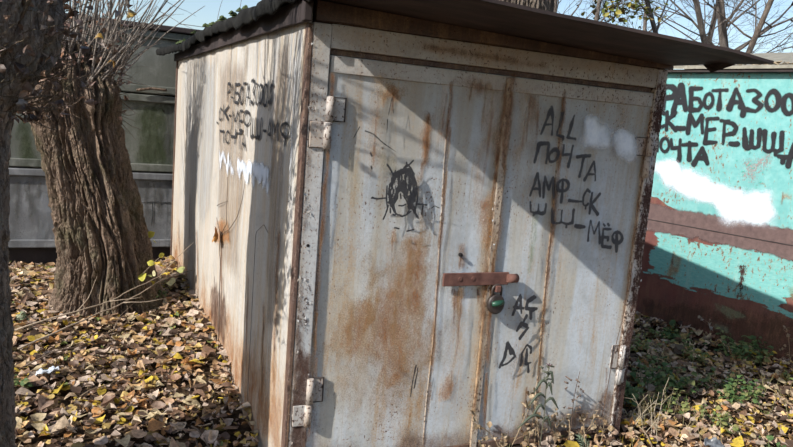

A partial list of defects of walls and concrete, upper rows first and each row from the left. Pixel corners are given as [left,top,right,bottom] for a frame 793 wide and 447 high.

corrosion [174,221,282,447]
corrosion [342,218,444,387]
corrosion [419,114,431,177]
corrosion [473,285,493,424]
corrosion [483,75,514,272]
corrosion [543,92,566,315]
peeling [612,181,793,437]
corrosion [643,300,793,367]
corrosion [647,203,793,261]